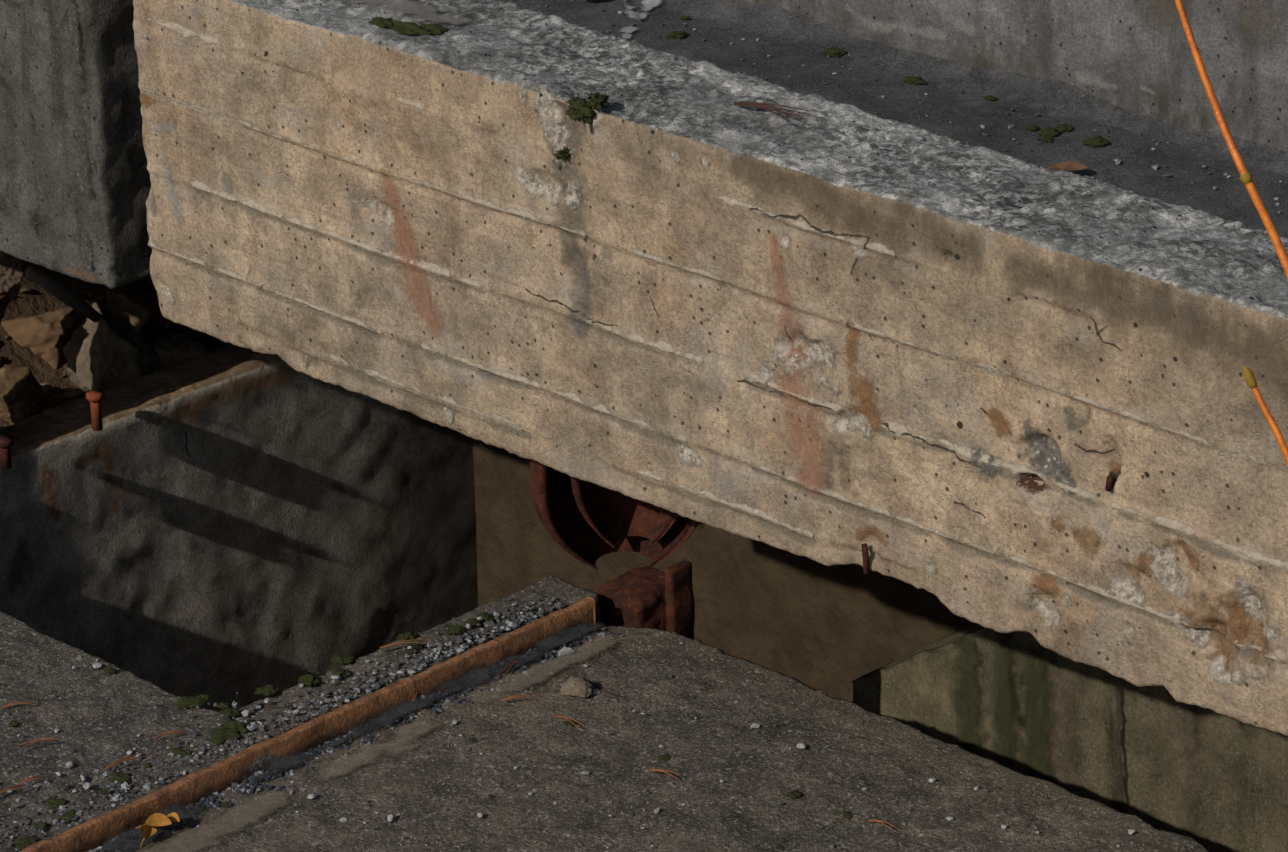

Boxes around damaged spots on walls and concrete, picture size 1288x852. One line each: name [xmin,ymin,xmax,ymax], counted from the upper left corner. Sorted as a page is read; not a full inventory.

spalling [586,109,603,133]
spalling [511,86,583,211]
crack [749,208,870,275]
crack [525,289,617,326]
corrosion [846,323,880,431]
corrosion [989,408,1009,436]
spalling [676,444,702,467]
spalling [972,447,1000,479]
spalling [1020,420,1077,494]
spalling [1051,517,1100,555]
spalling [1024,594,1072,631]
spalling [1107,543,1278,685]